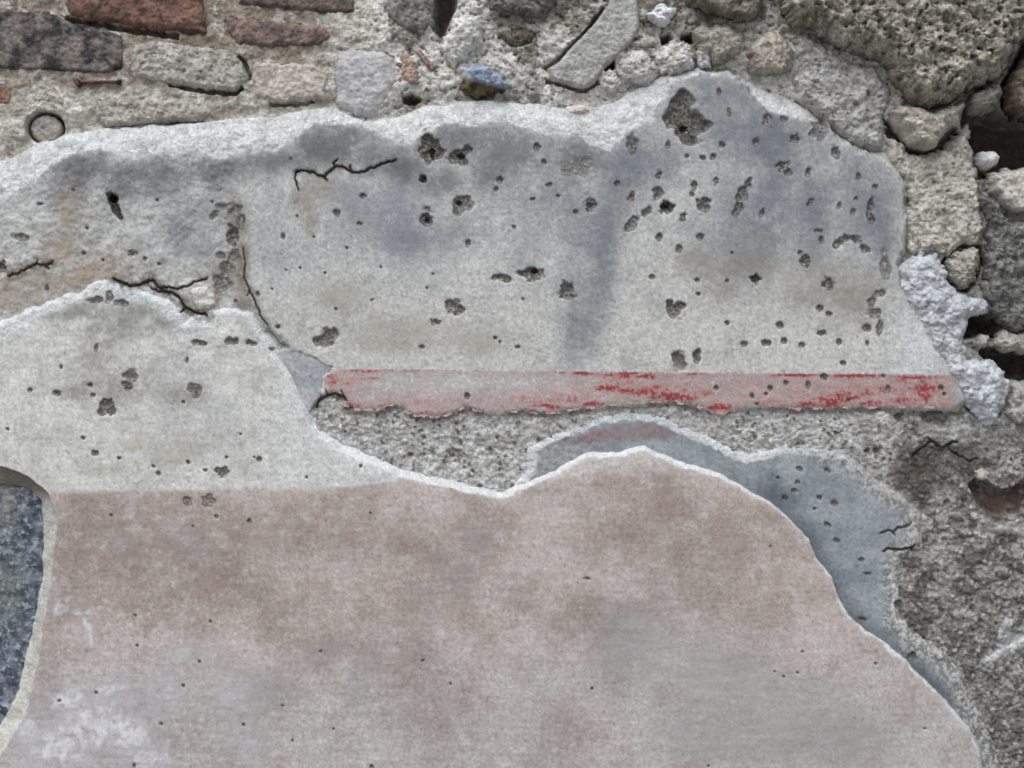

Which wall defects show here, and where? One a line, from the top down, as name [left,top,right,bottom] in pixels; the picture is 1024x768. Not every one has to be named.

spalling [419,134,472,165]
spalling [627,134,638,155]
spalling [663,90,725,160]
spalling [791,121,830,143]
crack [294,159,395,190]
crack [7,259,54,280]
crack [113,276,209,318]
crack [241,248,268,326]
peeling [336,393,484,425]
peeling [750,381,909,421]
crack [912,437,977,461]
crack [880,524,915,552]